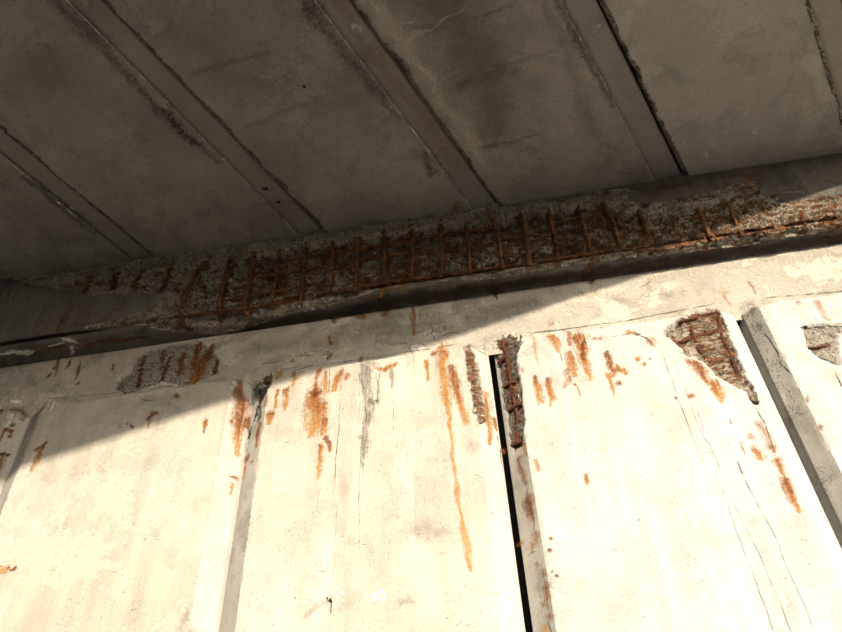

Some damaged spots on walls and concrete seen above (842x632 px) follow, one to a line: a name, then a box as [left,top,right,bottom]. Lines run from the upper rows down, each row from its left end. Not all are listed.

spalling [0,0,842,335]
spalling [116,343,219,395]
rust [229,359,297,494]
rust [304,336,350,478]
rust [424,344,472,571]
spalling [493,333,526,452]
rust [534,375,555,407]
rust [547,331,600,395]
rust [604,351,628,393]
spalling [666,307,757,402]
rust [769,442,801,512]
spalling [800,324,842,366]